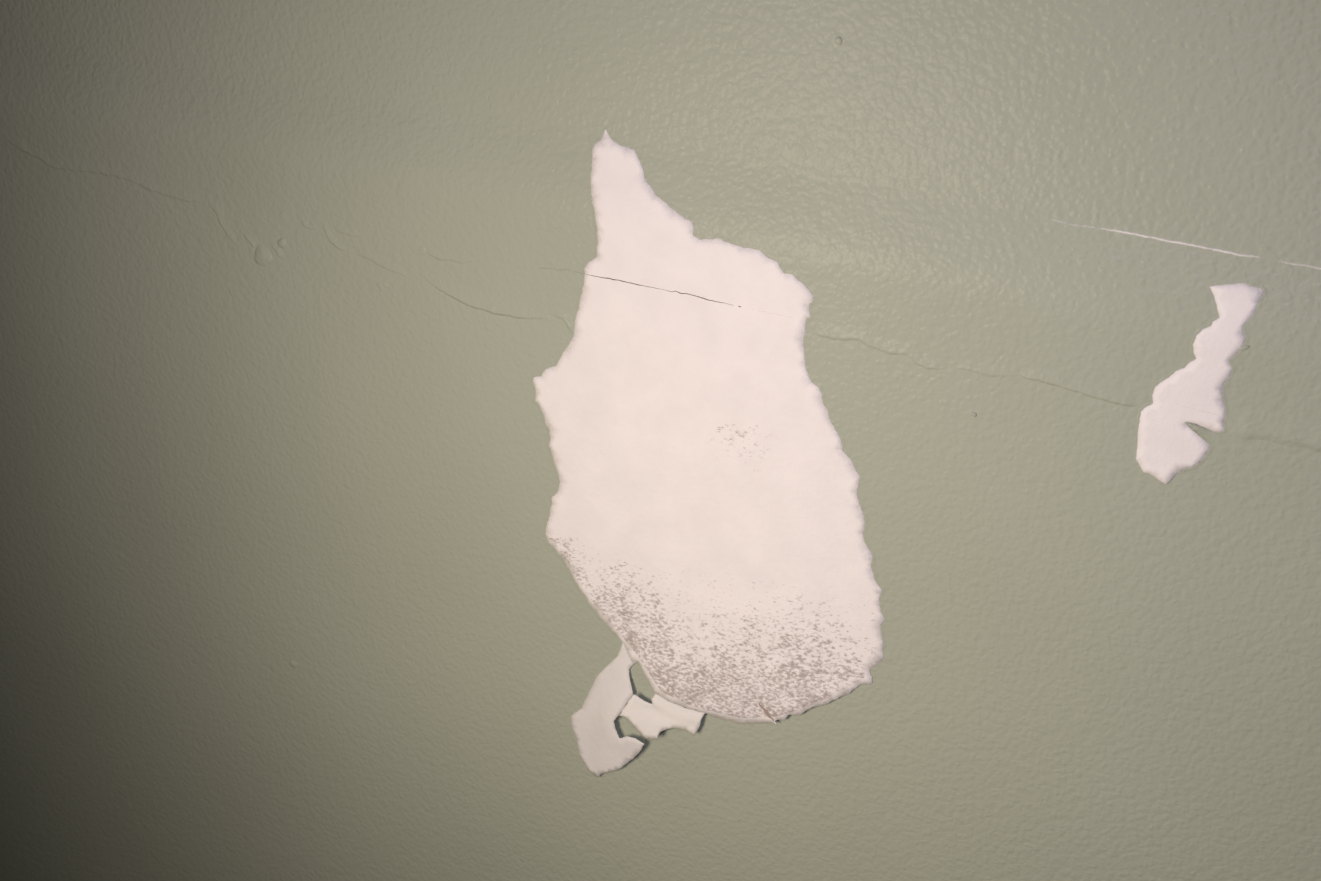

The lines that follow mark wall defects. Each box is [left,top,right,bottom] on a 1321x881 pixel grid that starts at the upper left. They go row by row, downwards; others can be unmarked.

crack [539,268,792,318]
peeling [530,127,888,777]
crack [1050,219,1321,269]
peeling [1134,279,1267,484]